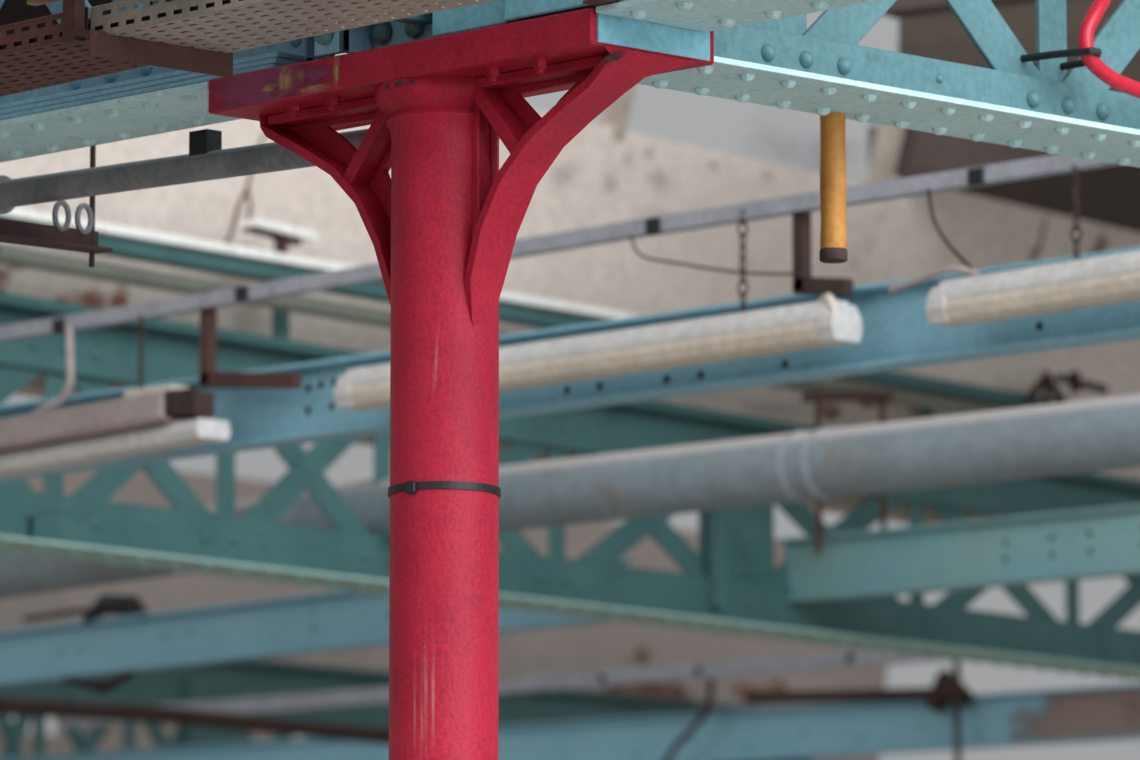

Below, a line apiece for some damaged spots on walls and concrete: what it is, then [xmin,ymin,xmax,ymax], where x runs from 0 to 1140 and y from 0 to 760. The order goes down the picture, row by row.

peeling [207,59,339,110]
corrosion [56,289,128,308]
peeling [1012,689,1140,742]